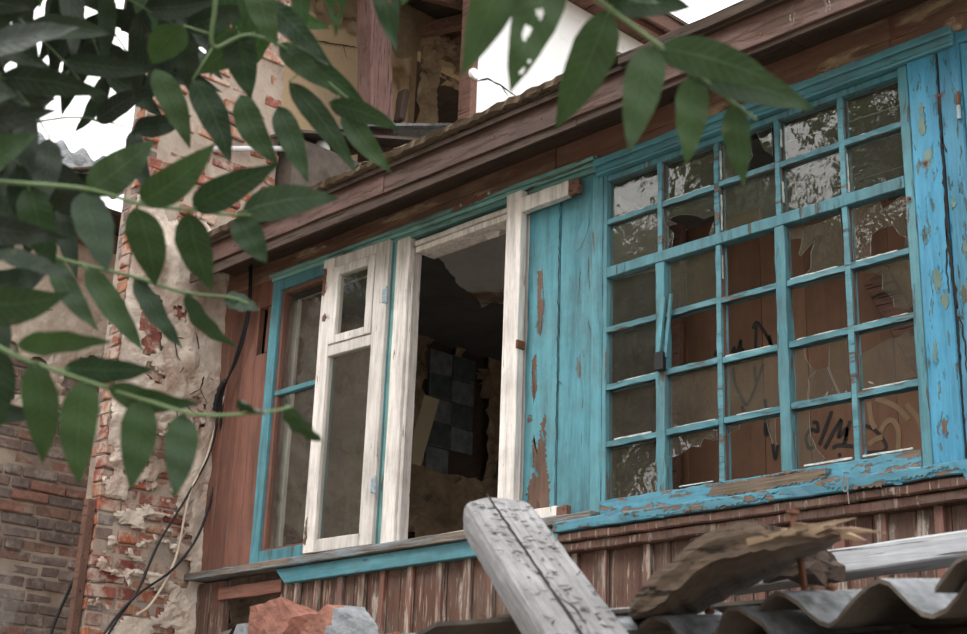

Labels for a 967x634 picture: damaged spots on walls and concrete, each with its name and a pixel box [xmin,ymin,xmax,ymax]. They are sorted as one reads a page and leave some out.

peeling [918,102,927,136]
peeling [923,148,933,169]
peeling [438,229,506,308]
peeling [535,270,544,336]
peeling [613,194,687,265]
peeling [933,264,967,309]
crack [936,58,967,459]
flaking render [139,307,166,385]
peeling [525,354,551,509]
peeling [624,459,967,518]